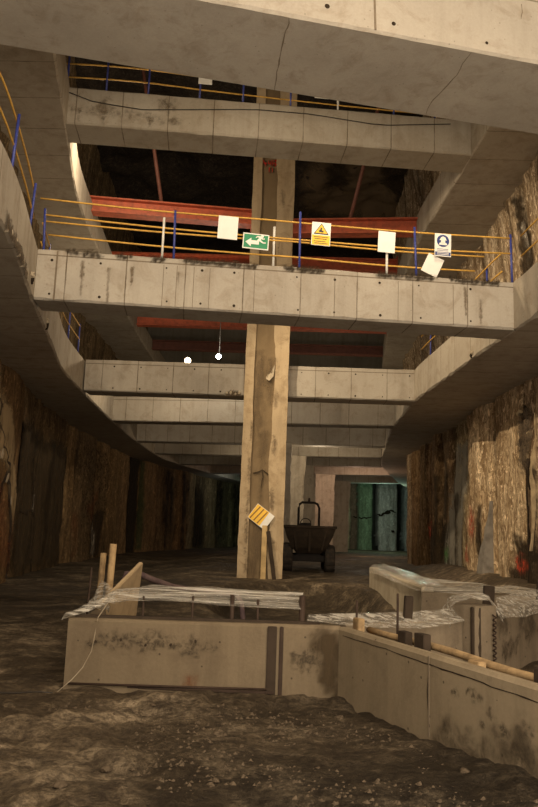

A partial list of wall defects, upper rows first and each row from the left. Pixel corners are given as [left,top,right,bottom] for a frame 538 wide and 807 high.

crack [353,510,396,533]